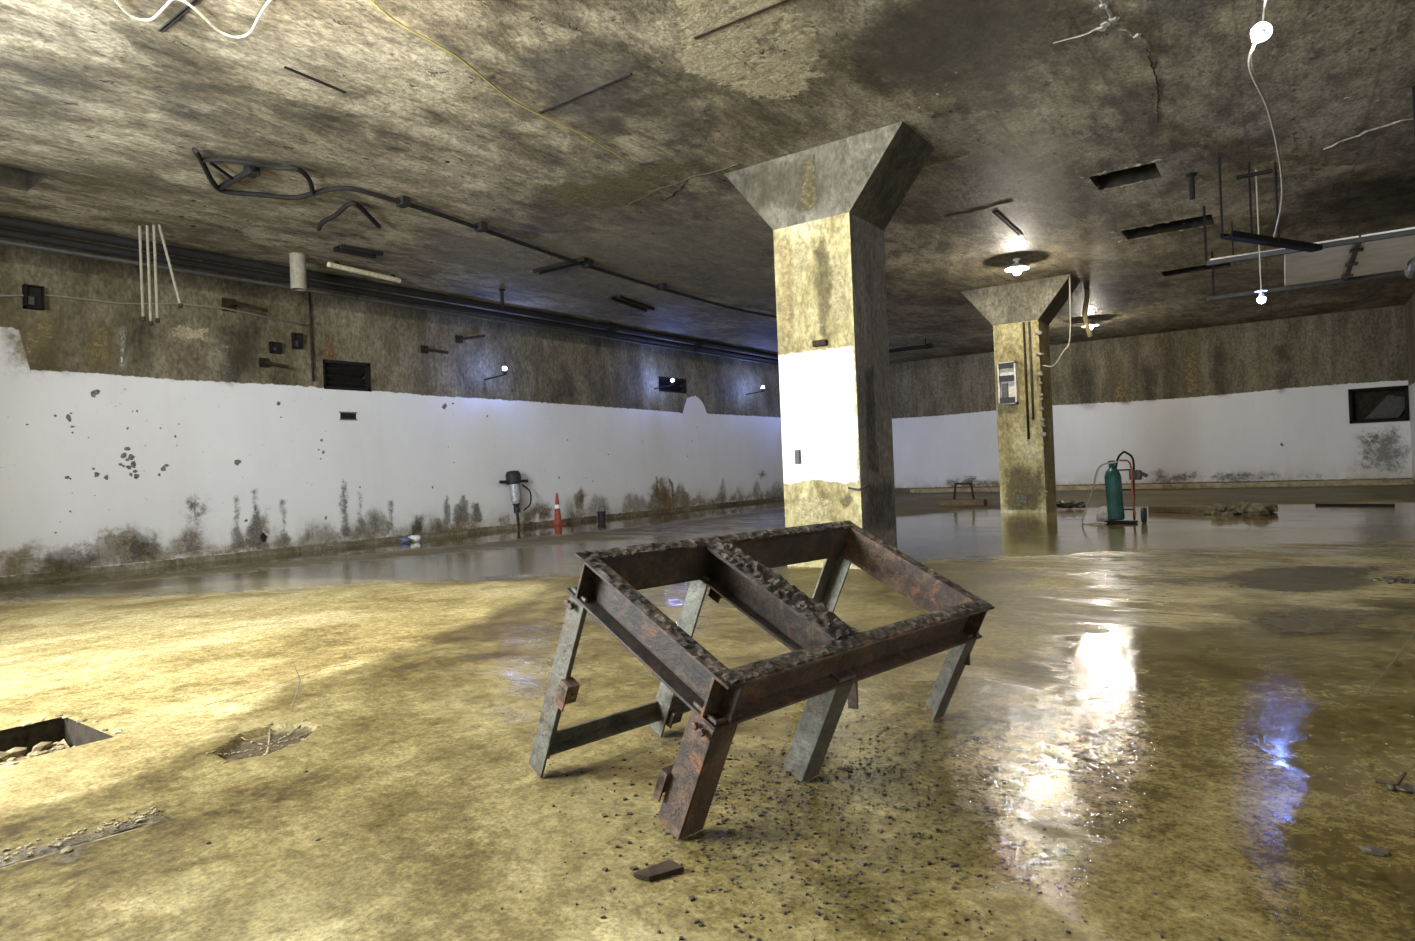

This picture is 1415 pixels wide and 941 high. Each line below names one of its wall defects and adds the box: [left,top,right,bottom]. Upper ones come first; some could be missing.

peeling [662,0,826,100]
crack [1053,0,1160,122]
water stain [1362,430,1409,470]
water stain [625,473,784,513]
water stain [0,487,393,577]
water stain [408,496,481,535]
water stain [500,504,551,524]